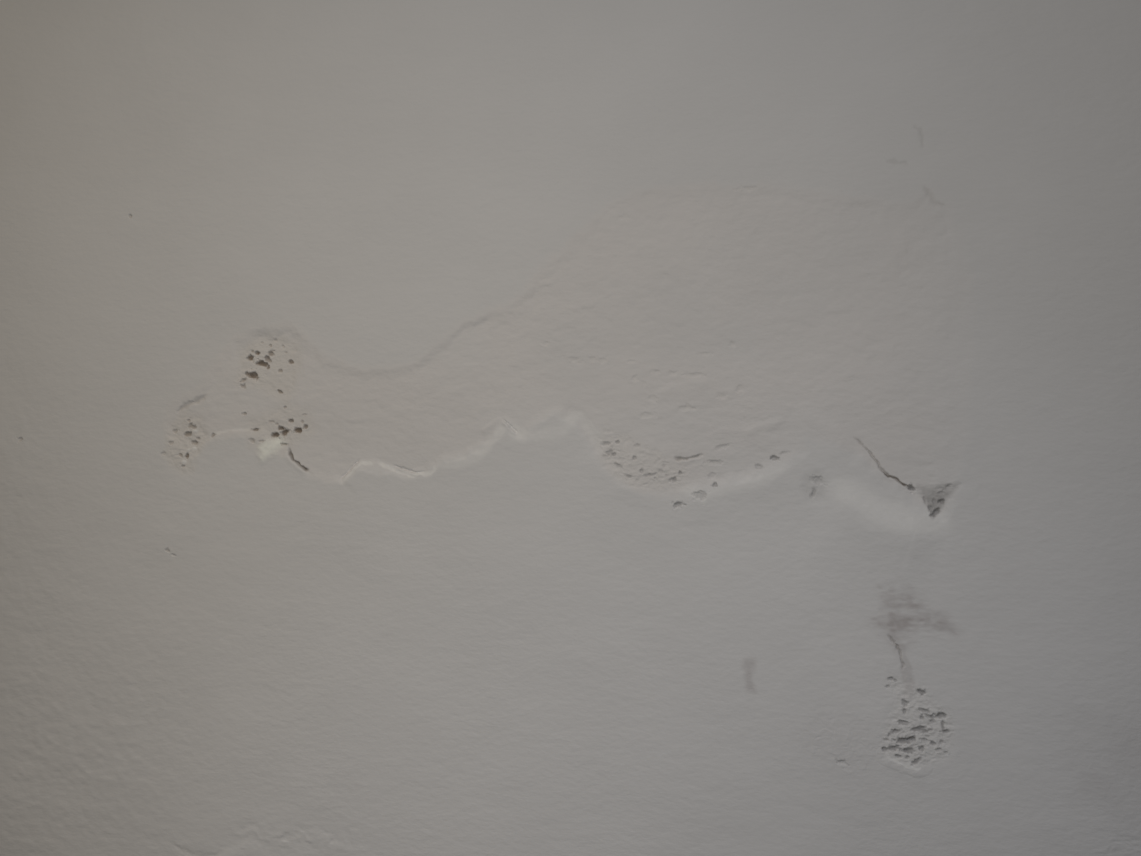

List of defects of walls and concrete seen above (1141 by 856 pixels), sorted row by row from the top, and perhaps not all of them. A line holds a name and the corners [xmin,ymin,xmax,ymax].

crack [836,421,930,501]